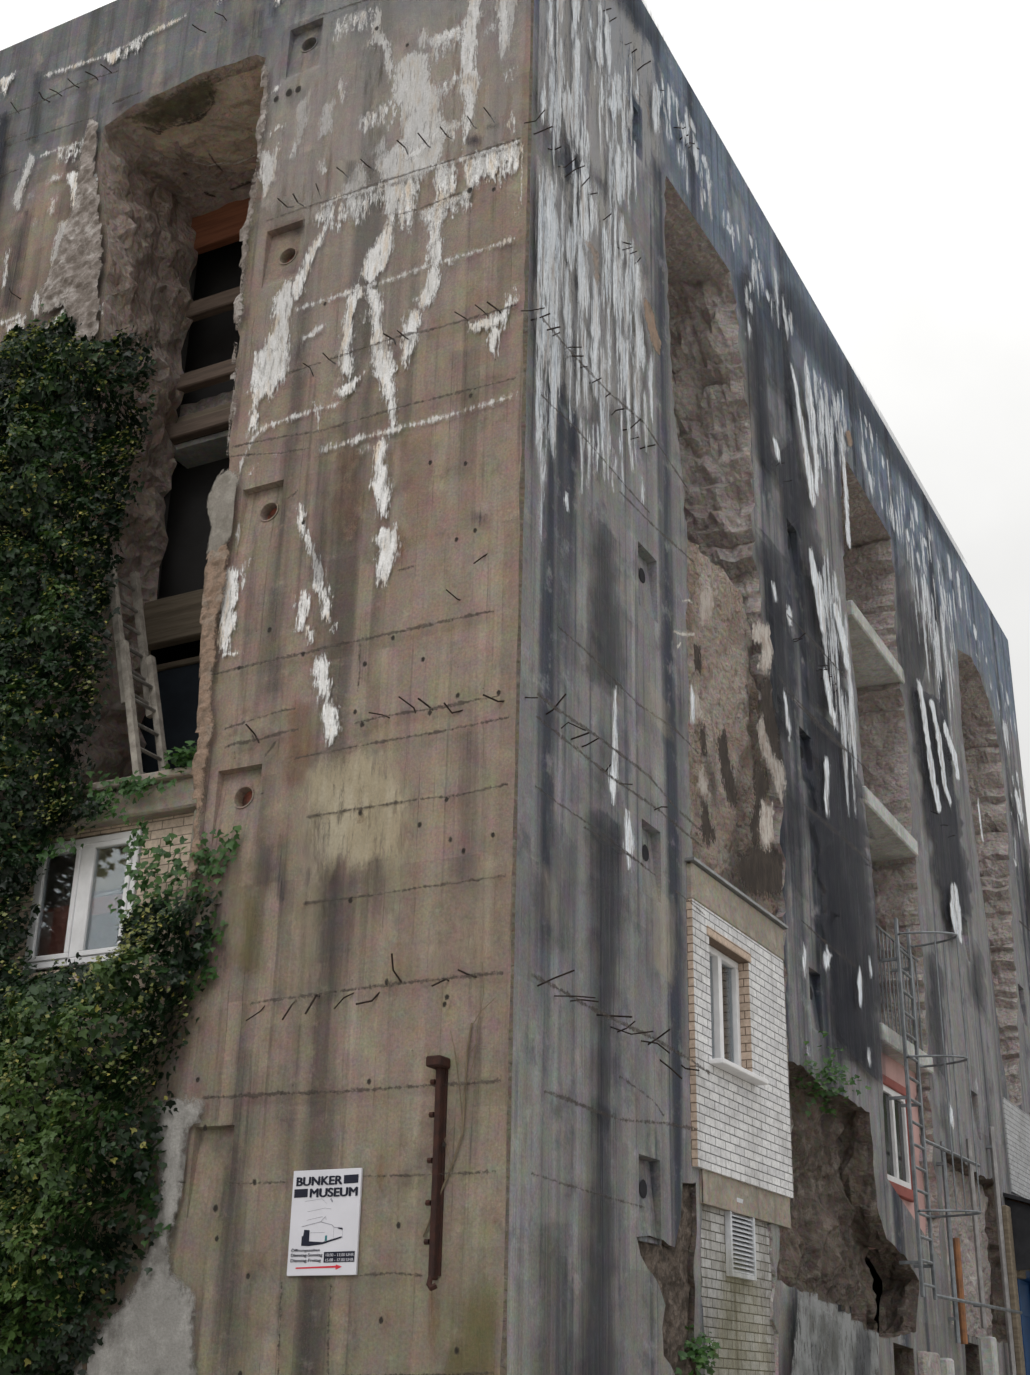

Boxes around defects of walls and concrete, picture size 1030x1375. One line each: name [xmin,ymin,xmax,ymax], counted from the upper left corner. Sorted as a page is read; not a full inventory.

spalling [39,119,104,341]
spalling [218,63,301,476]
spalling [643,298,661,355]
damp [240,0,987,1081]
spalling [399,693,463,716]
spalling [483,0,624,1375]
peeling [686,539,787,915]
damp [990,684,1016,754]
damp [1011,771,1025,867]
damp [583,520,634,1375]
spalling [537,970,700,1079]
spalling [638,1184,693,1375]